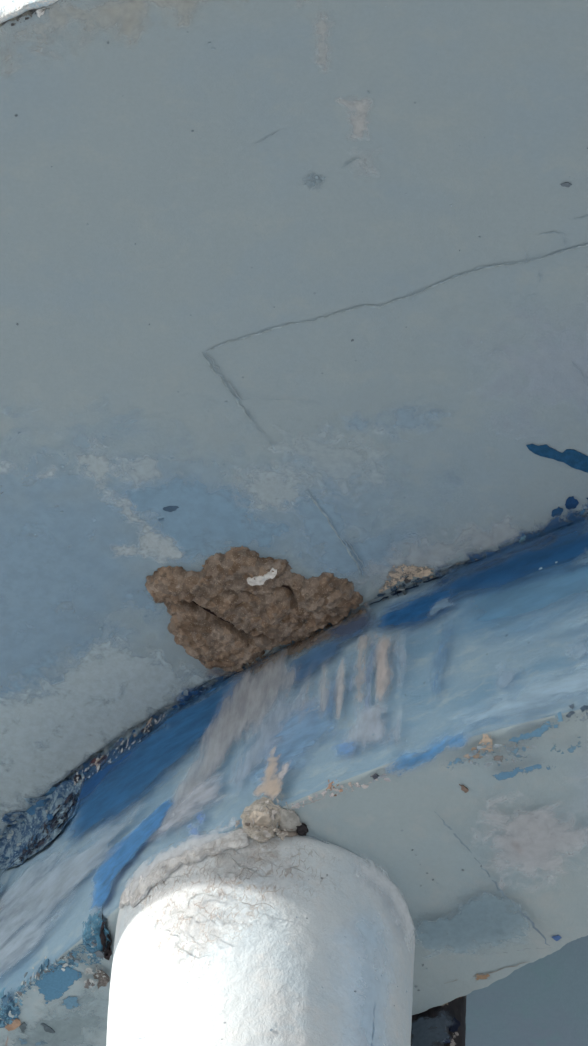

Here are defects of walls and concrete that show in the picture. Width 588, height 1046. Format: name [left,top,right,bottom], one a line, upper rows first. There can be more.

spalling [0,0,66,27]
crack [202,215,588,450]
crack [369,550,500,605]
peeling [374,519,547,601]
peeling [551,496,588,521]
damp [66,501,588,908]
peeling [0,637,210,974]
crack [434,811,562,955]
spalling [0,903,112,1046]
peeling [411,997,462,1046]